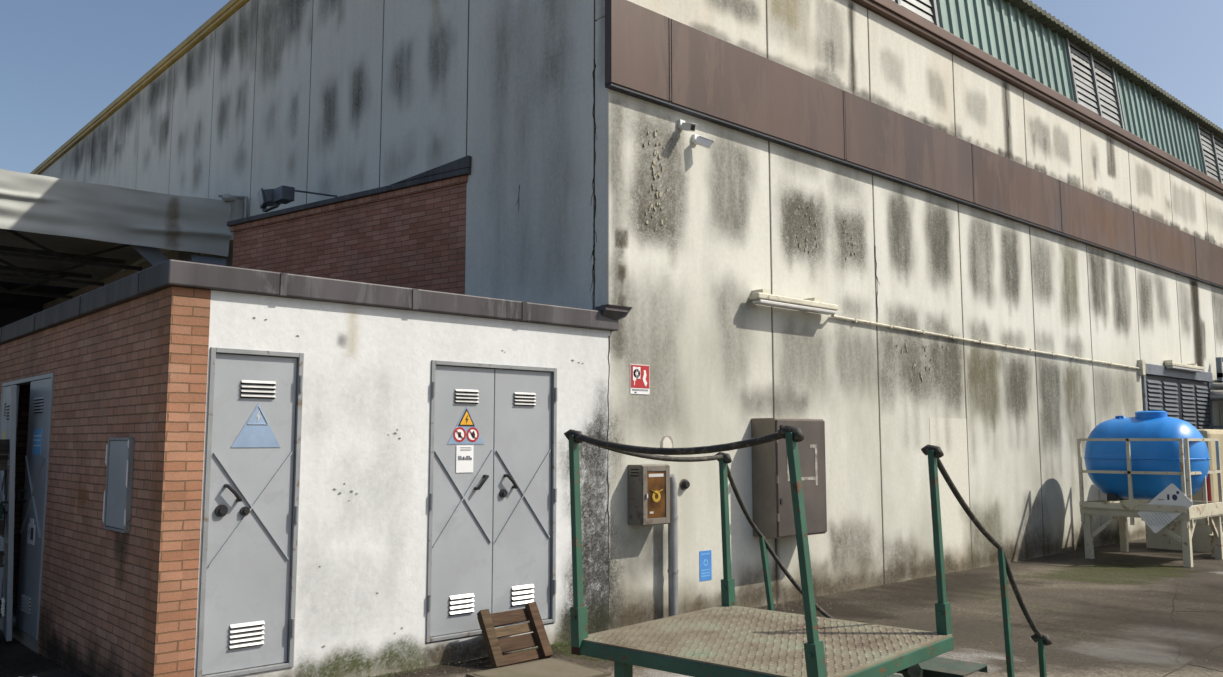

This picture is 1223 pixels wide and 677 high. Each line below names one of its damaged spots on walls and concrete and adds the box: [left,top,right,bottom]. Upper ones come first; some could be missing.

crack [589,59,597,302]
water stain [632,115,684,240]
water stain [782,193,865,262]
water stain [889,193,910,267]
water stain [928,206,950,276]
water stain [971,225,1019,297]
water stain [1090,253,1126,326]
water stain [1191,281,1223,367]
water stain [883,313,1081,440]
crack [603,336,611,616]
water stain [551,418,646,654]
water stain [390,640,490,677]